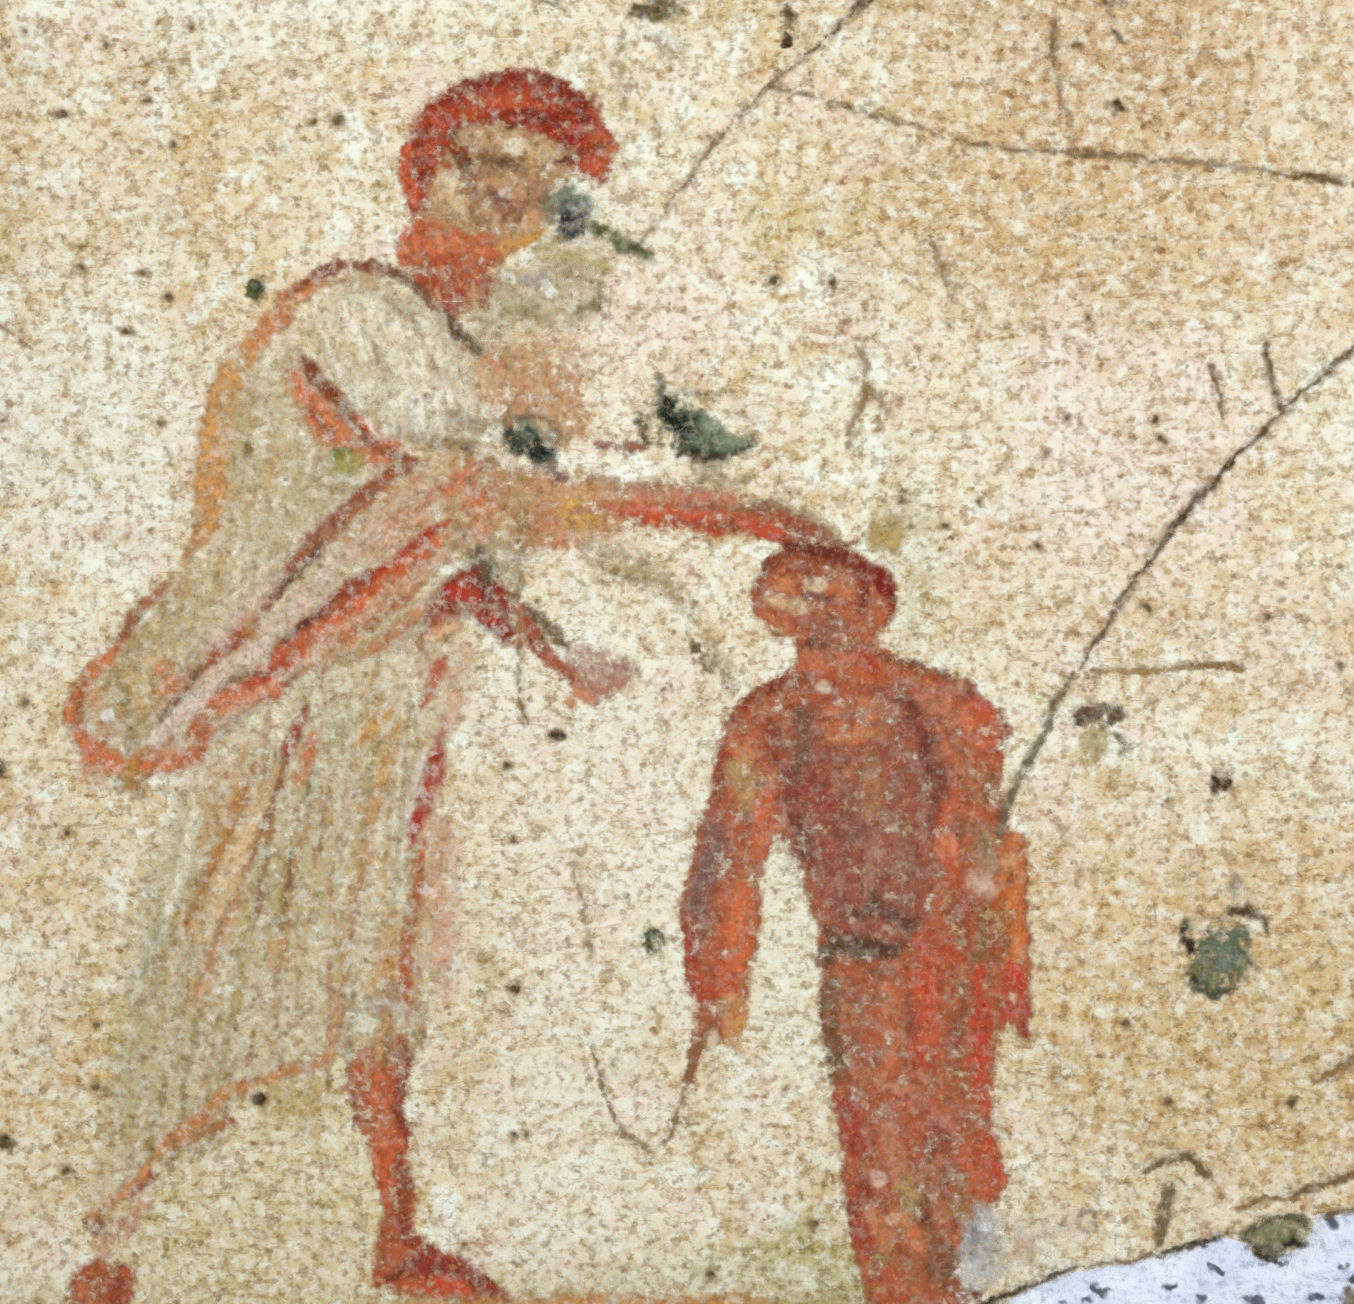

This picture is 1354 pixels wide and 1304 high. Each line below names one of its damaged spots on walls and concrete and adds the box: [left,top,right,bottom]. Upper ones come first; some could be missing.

crack [642,0,1354,242]
crack [997,334,1354,836]
leakage [1181,905,1269,1000]
spalling [959,1207,1048,1289]
spalling [1186,1244,1224,1276]
spalling [1239,1213,1308,1266]
spalling [1325,1212,1338,1229]
spalling [1082,1284,1109,1302]
spalling [1244,1295,1265,1304]